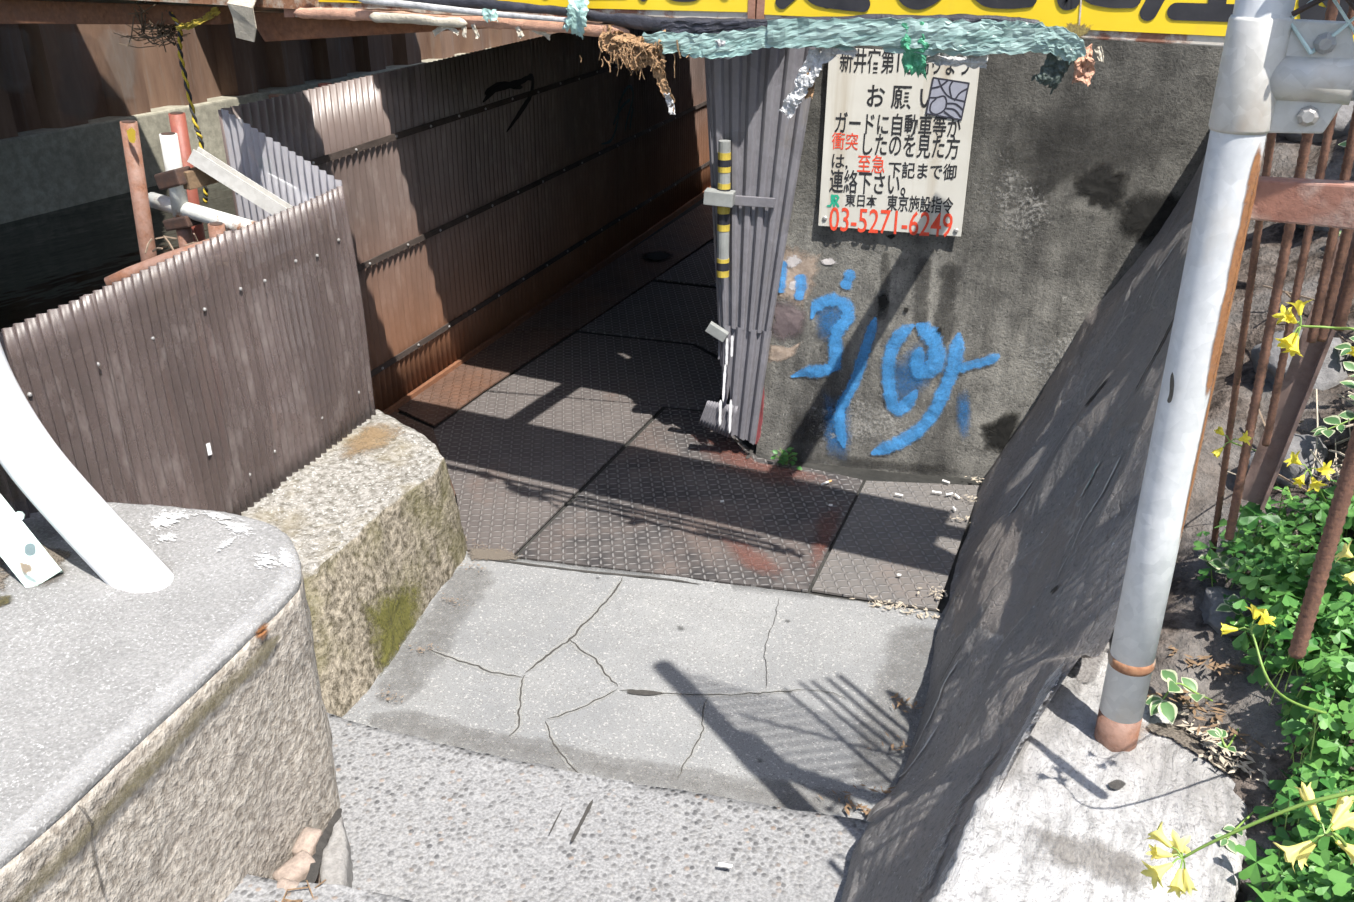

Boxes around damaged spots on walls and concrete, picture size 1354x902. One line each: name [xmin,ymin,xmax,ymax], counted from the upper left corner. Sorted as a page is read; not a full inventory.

leakage [991,173,1050,243]
leakage [1075,163,1181,243]
crack [430,580,846,777]